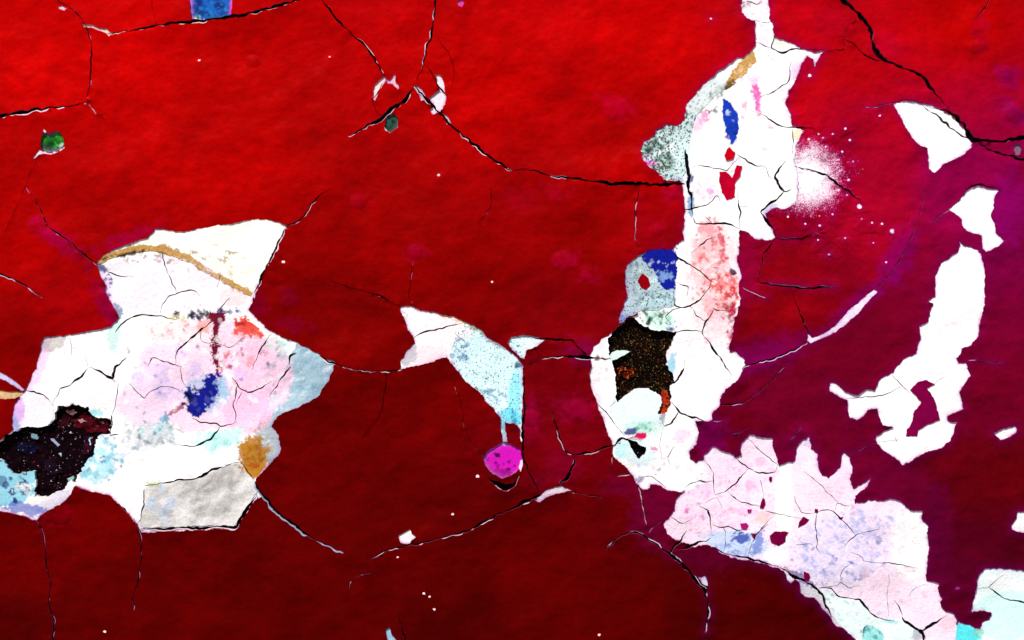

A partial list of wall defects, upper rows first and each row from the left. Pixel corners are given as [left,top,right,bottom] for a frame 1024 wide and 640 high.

crack [0,103,102,118]
crack [58,0,300,73]
crack [833,0,1024,161]
peeling [0,219,334,533]
peeling [400,306,544,478]
crack [322,0,941,640]
peeling [589,0,1024,640]